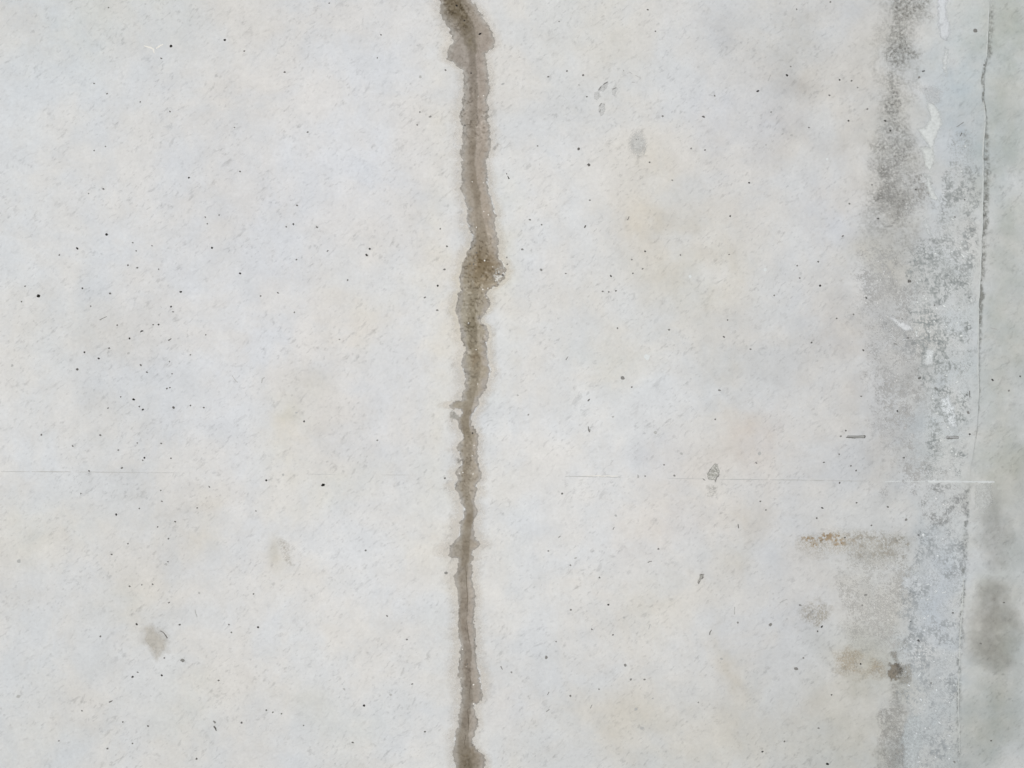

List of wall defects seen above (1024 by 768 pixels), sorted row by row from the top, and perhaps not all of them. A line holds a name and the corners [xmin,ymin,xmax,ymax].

water stain [440,0,510,768]
water stain [918,88,942,200]